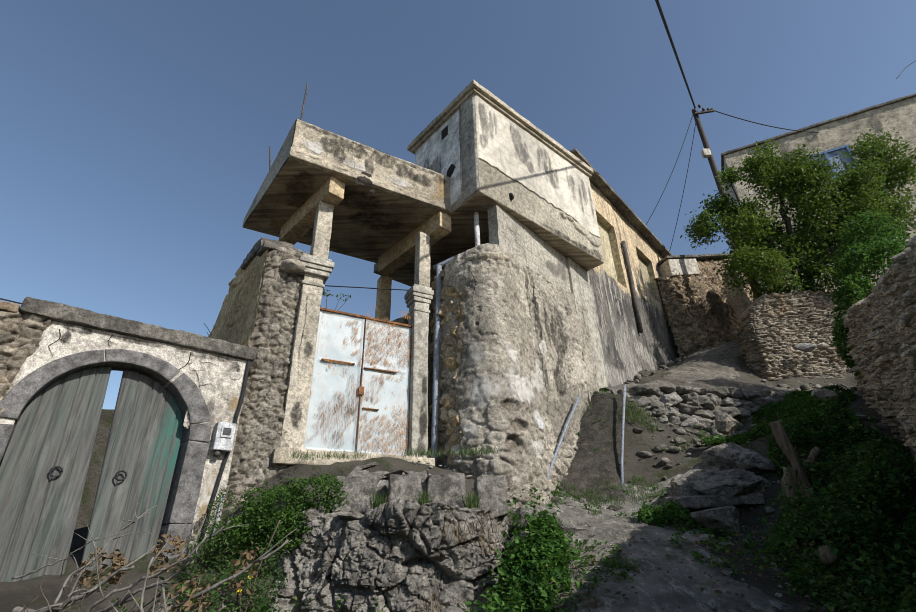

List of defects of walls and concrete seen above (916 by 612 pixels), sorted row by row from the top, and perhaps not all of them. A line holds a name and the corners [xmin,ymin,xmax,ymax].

damp [342,189,400,231]
damp [303,125,447,200]
damp [479,104,497,145]
damp [512,131,602,214]
corrosion [309,313,412,455]
spalling [428,270,464,470]
damp [470,274,568,429]
damp [531,439,544,460]